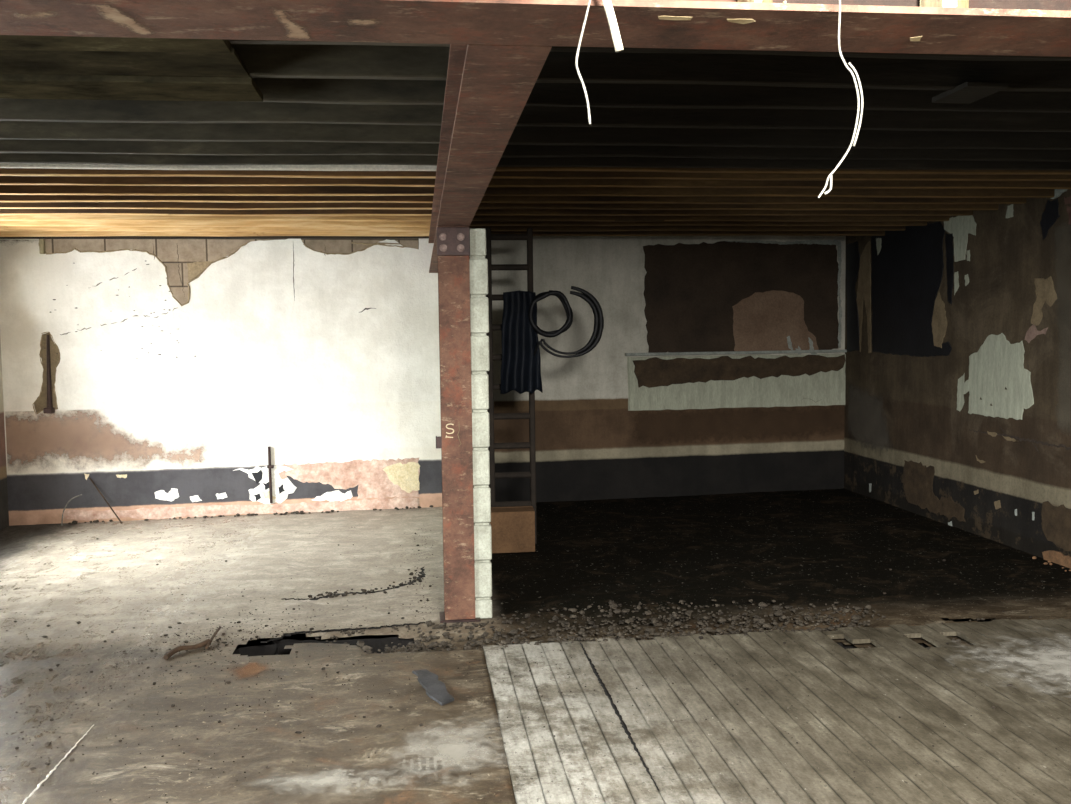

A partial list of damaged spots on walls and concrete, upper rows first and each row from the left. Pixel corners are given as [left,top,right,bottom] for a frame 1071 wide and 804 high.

flaking render [45,239,285,314]
peeling [944,215,977,295]
spalling [1040,198,1060,240]
flaking render [33,332,60,414]
peeling [957,276,1057,420]
peeling [63,458,433,524]
peeling [901,460,966,526]
peeling [1032,501,1071,571]